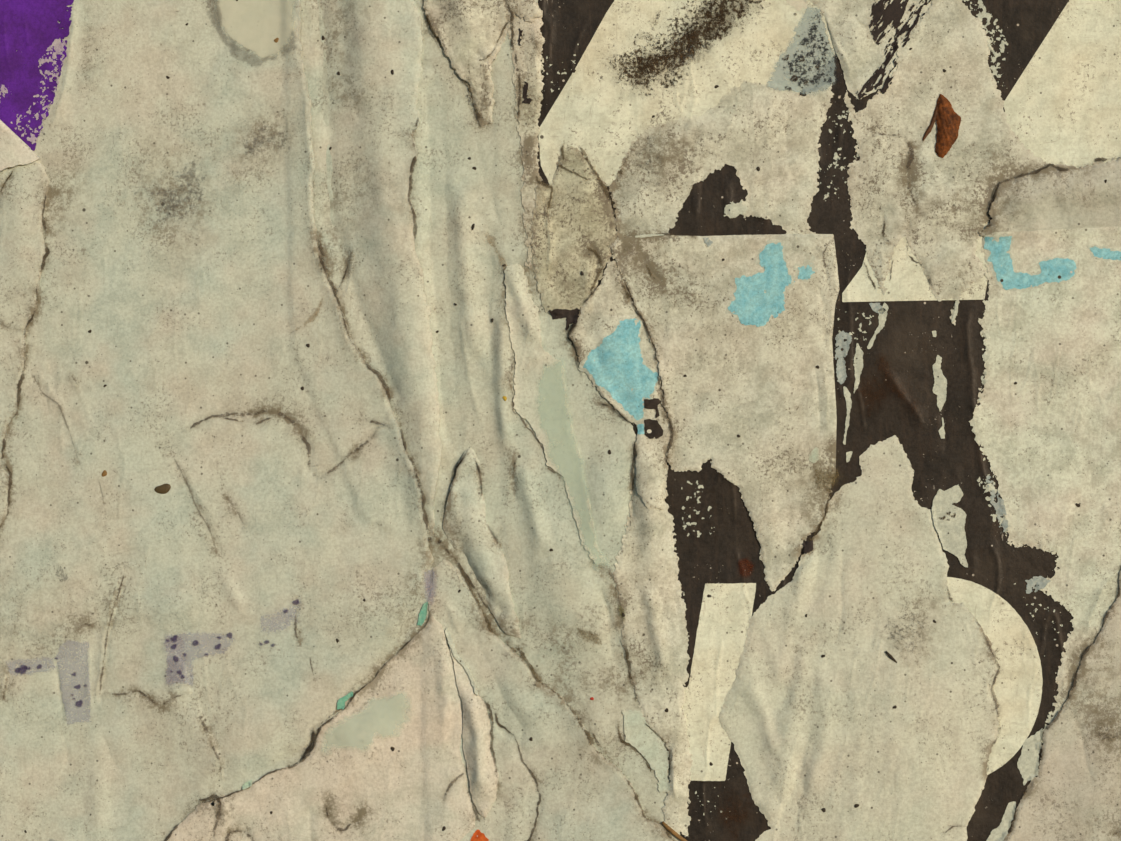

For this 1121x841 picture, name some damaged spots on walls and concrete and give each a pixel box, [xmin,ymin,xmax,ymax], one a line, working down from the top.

mould [609,0,764,97]
crack [408,119,419,238]
crack [536,145,634,214]
crack [1,195,50,516]
crack [191,239,674,841]
peeling [932,485,968,567]
peeling [986,475,1008,532]
peeling [1025,576,1051,594]
peeling [1017,728,1043,785]
peeling [986,801,1016,841]